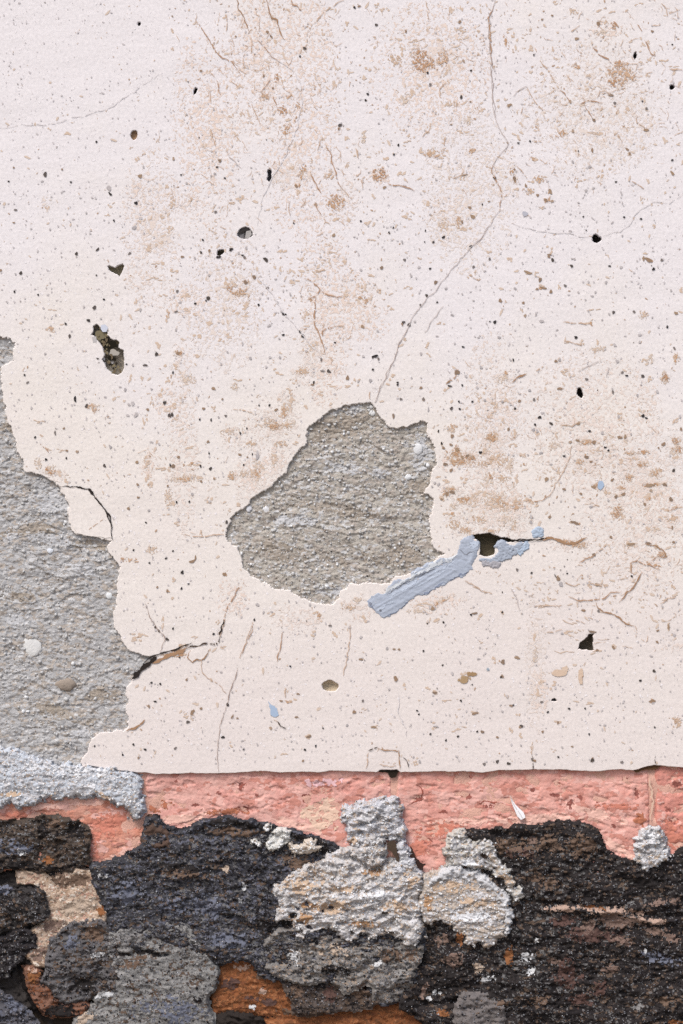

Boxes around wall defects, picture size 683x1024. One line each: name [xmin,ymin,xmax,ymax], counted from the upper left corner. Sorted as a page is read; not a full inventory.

crack [369,0,678,401]
hole [87,305,124,375]
spalling [0,337,155,766]
crack [57,485,113,540]
spalling [225,403,455,605]
crack [466,537,667,633]
crack [131,587,253,790]